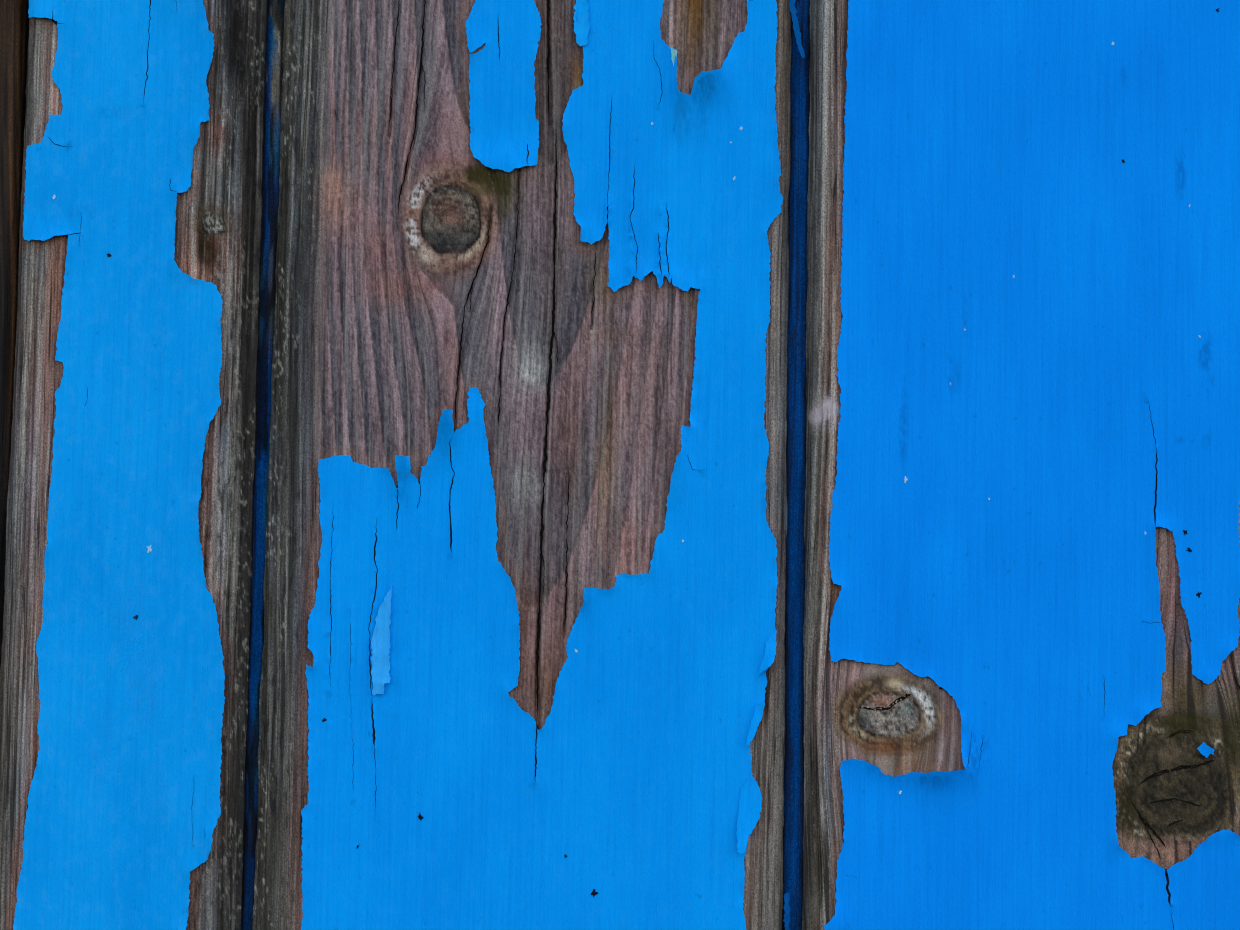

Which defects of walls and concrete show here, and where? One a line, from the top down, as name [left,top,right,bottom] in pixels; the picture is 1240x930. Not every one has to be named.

peeling [0,17,68,930]
peeling [174,0,700,930]
peeling [660,0,748,95]
peeling [736,0,965,930]
crack [1129,730,1214,930]
peeling [1112,527,1240,870]